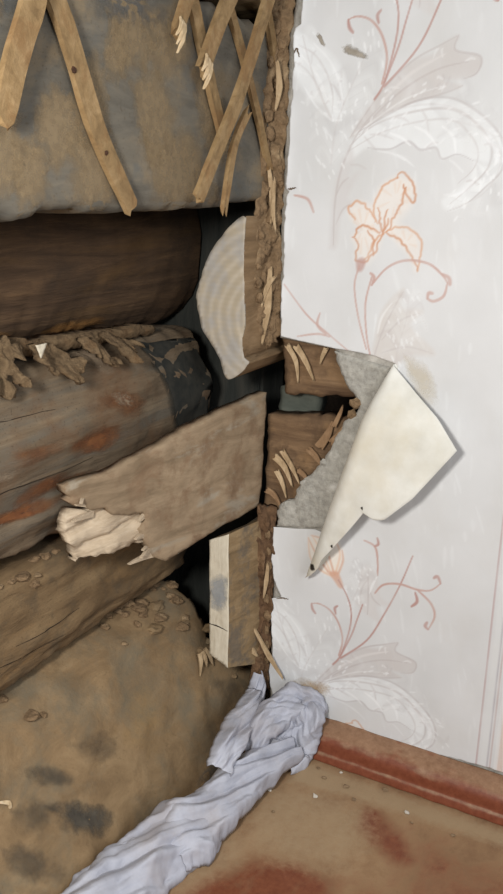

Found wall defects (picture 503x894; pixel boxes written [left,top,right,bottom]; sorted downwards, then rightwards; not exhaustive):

peeling [344,46,366,58]
crack [0,459,88,495]
spalling [249,351,390,690]